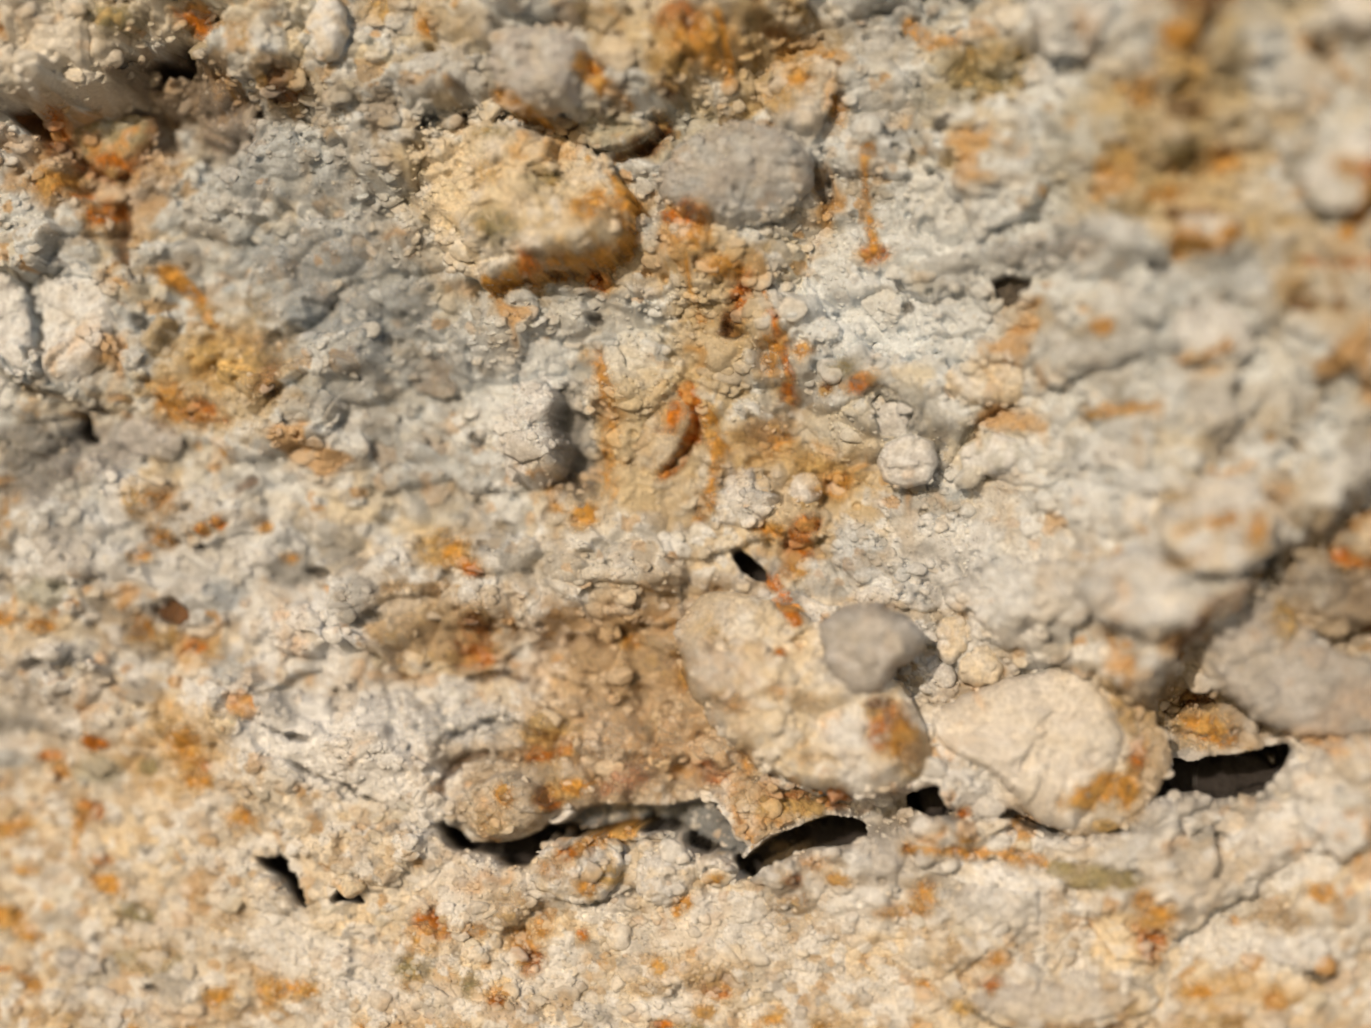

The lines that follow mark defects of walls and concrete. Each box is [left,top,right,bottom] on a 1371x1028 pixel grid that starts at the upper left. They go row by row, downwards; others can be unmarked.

corrosion [532,170,560,187]
corrosion [860,142,874,193]
corrosion [472,211,513,244]
corrosion [858,216,889,265]
corrosion [480,173,814,406]
corrosion [584,351,616,481]
corrosion [656,380,855,521]
corrosion [571,502,598,531]
corrosion [382,528,484,595]
corrosion [756,515,822,627]
crack [445,800,868,876]